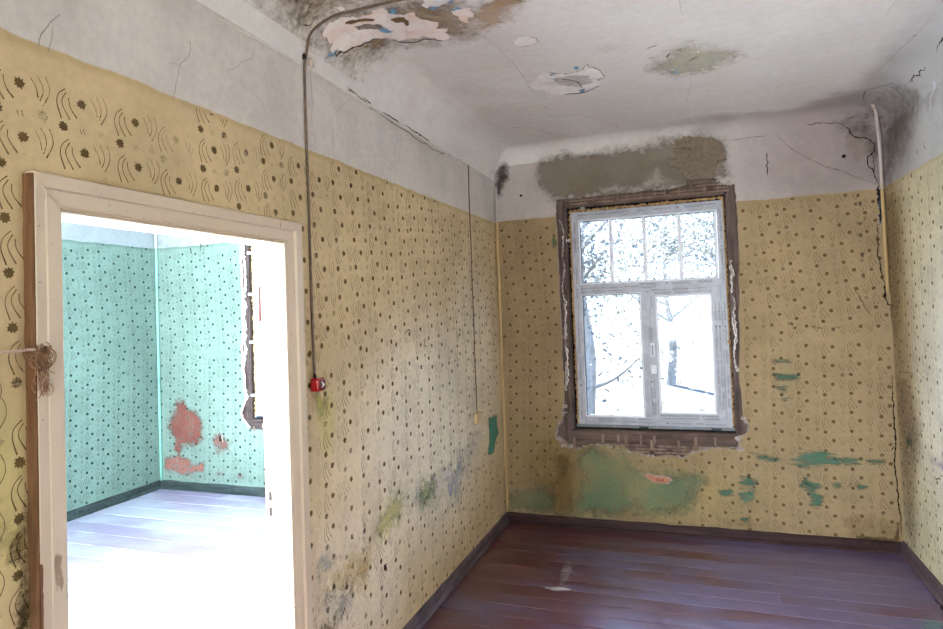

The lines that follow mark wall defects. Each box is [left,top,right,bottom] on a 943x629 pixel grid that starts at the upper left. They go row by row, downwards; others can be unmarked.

damp [284,0,341,25]
damp [344,38,397,64]
peeling [321,0,474,59]
damp [387,2,470,35]
peeling [528,64,605,95]
crack [863,15,943,104]
spalling [668,136,735,186]
crack [877,224,892,319]
spalling [552,220,750,459]
peeling [164,399,228,475]
peeling [718,476,758,502]
peeling [791,450,884,506]